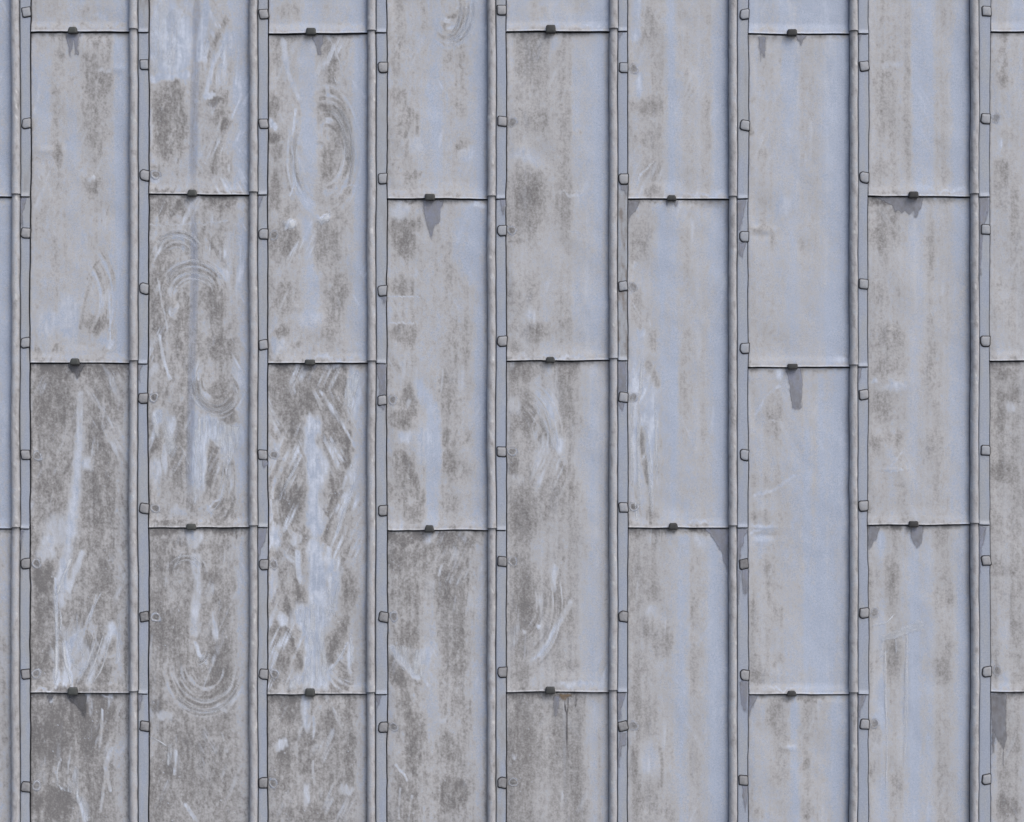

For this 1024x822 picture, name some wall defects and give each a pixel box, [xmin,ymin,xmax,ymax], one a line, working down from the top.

water stain [423,200,443,236]
water stain [877,197,923,218]
water stain [786,368,802,409]
water stain [706,528,747,595]
water stain [990,694,1007,765]